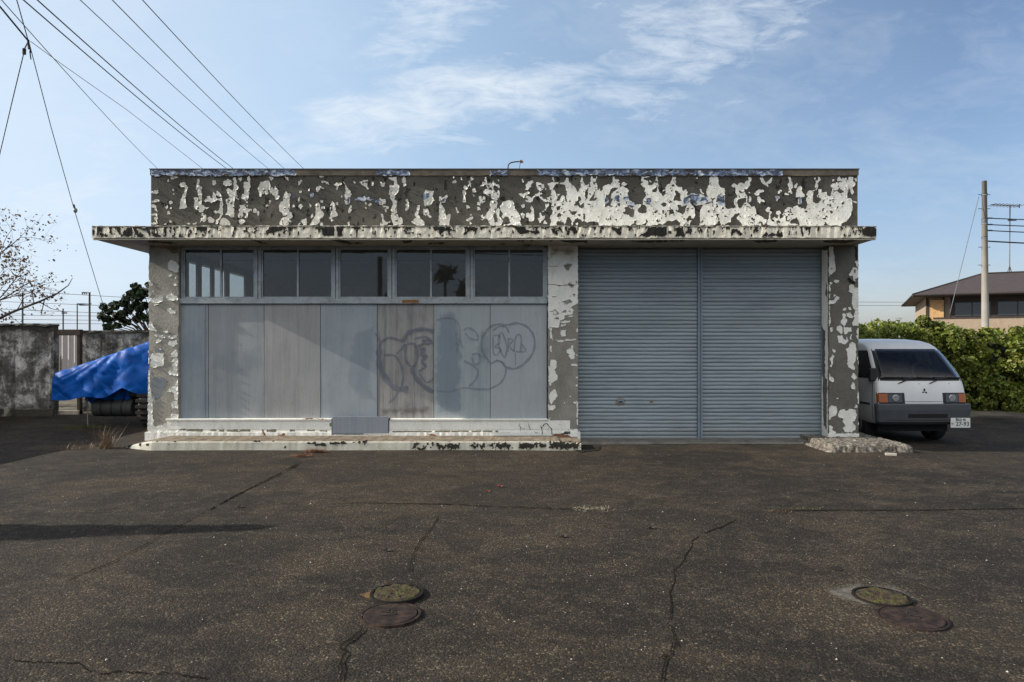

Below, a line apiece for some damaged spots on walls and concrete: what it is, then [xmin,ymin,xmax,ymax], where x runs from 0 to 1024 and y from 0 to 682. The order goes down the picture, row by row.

peeling [151,169,857,226]
peeling [147,260,276,432]
peeling [547,245,579,437]
peeling [822,246,859,434]